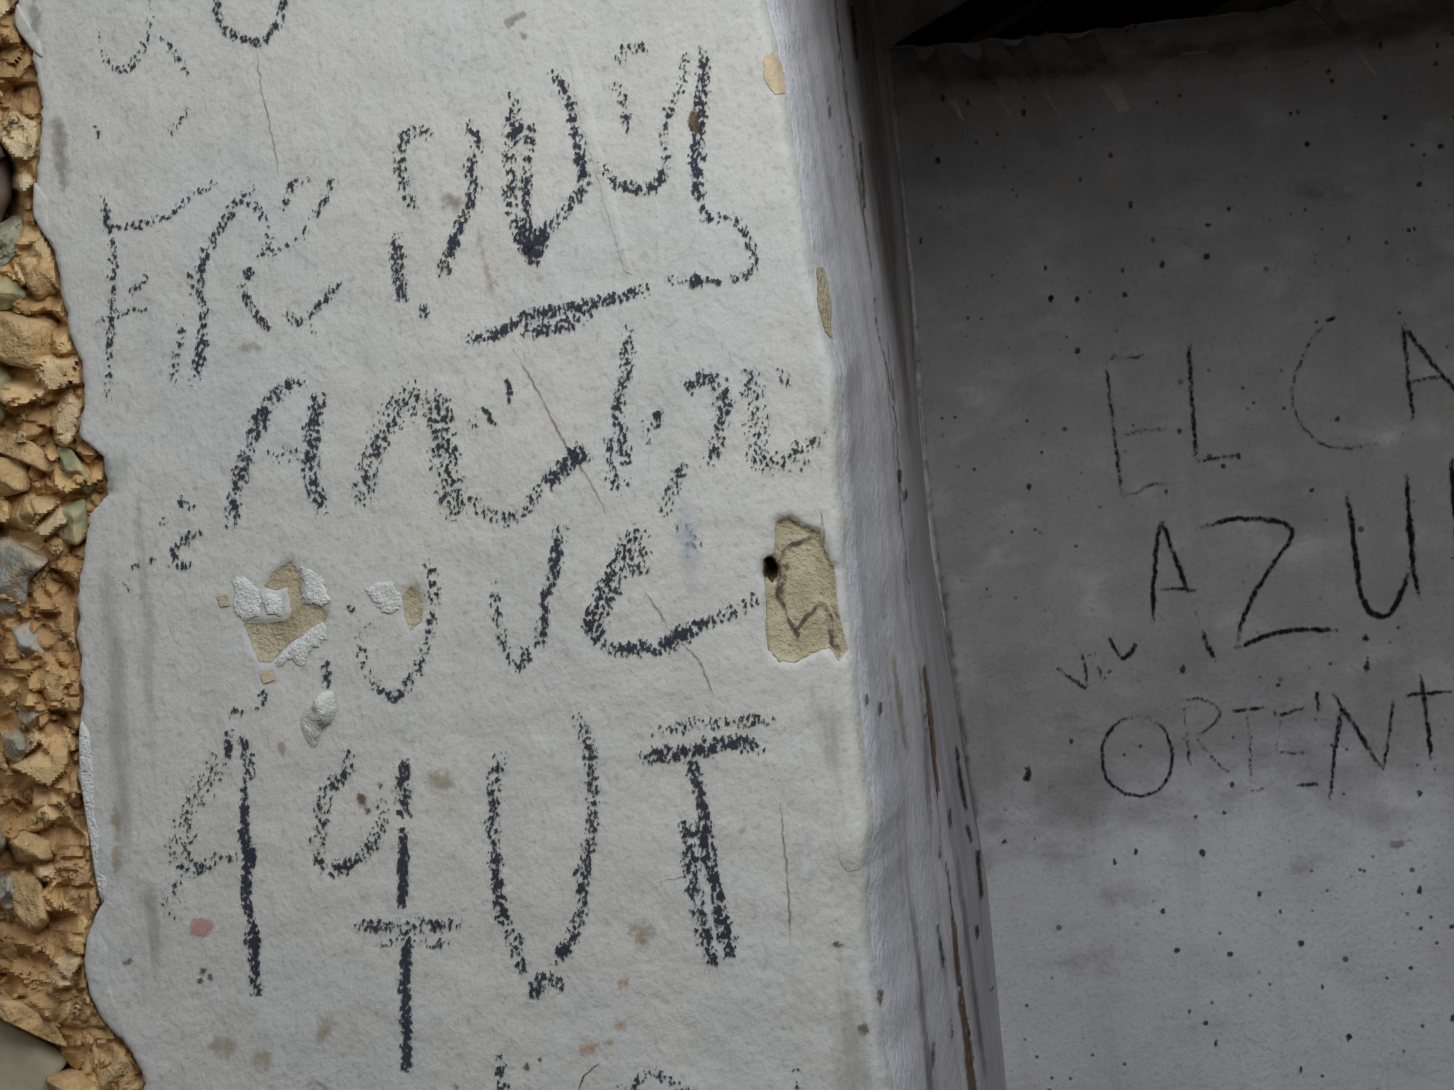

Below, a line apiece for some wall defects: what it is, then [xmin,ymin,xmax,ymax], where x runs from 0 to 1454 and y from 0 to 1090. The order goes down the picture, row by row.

flaking render [0,0,146,1090]
peeling [217,561,331,683]
peeling [763,518,848,662]
corrosion [923,665,940,813]
corrosion [946,863,982,1090]